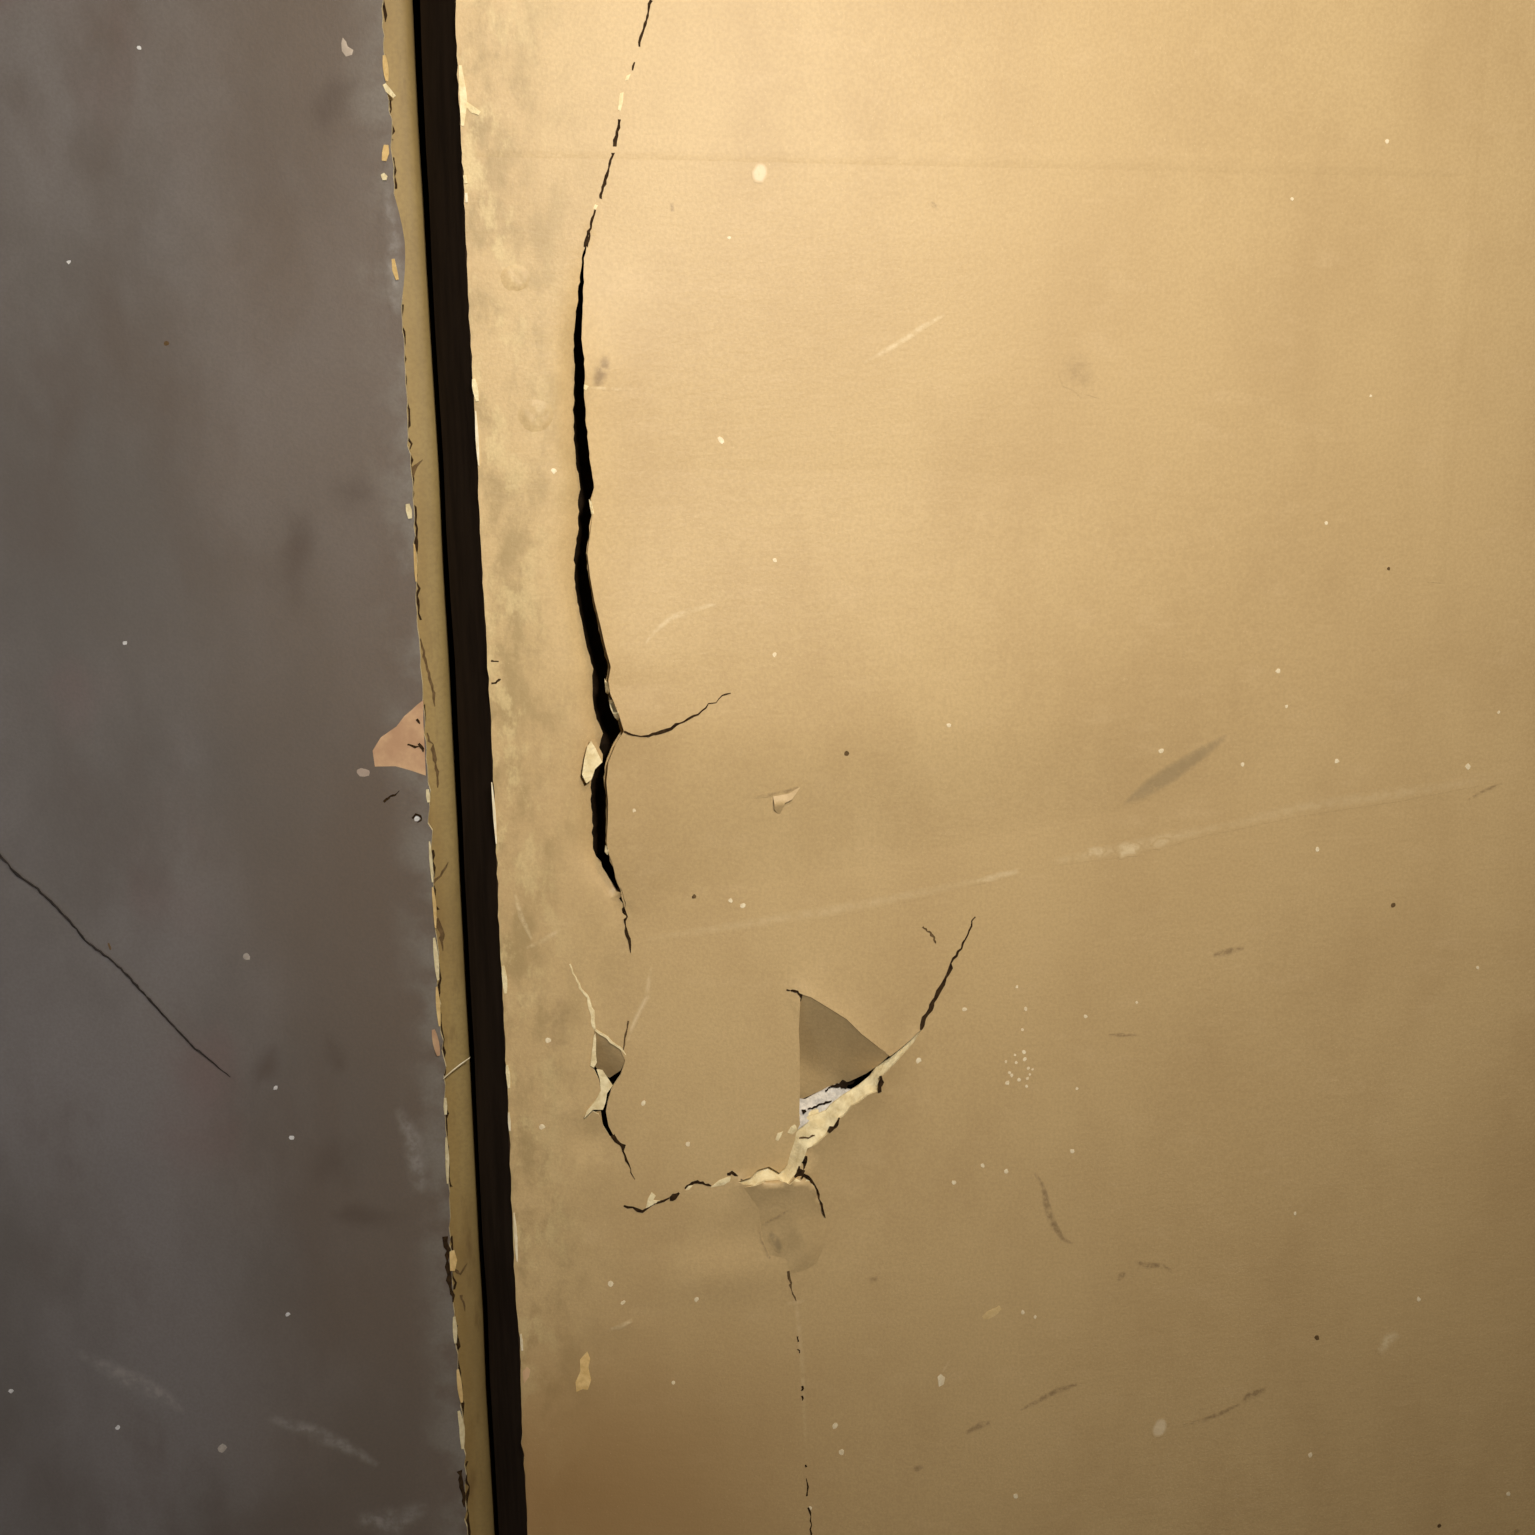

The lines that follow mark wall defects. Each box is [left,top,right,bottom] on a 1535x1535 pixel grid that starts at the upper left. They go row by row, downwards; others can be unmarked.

crack [573,0,731,953]
peeling [357,701,430,821]
crack [0,854,230,1077]
crack [785,1271,812,1535]